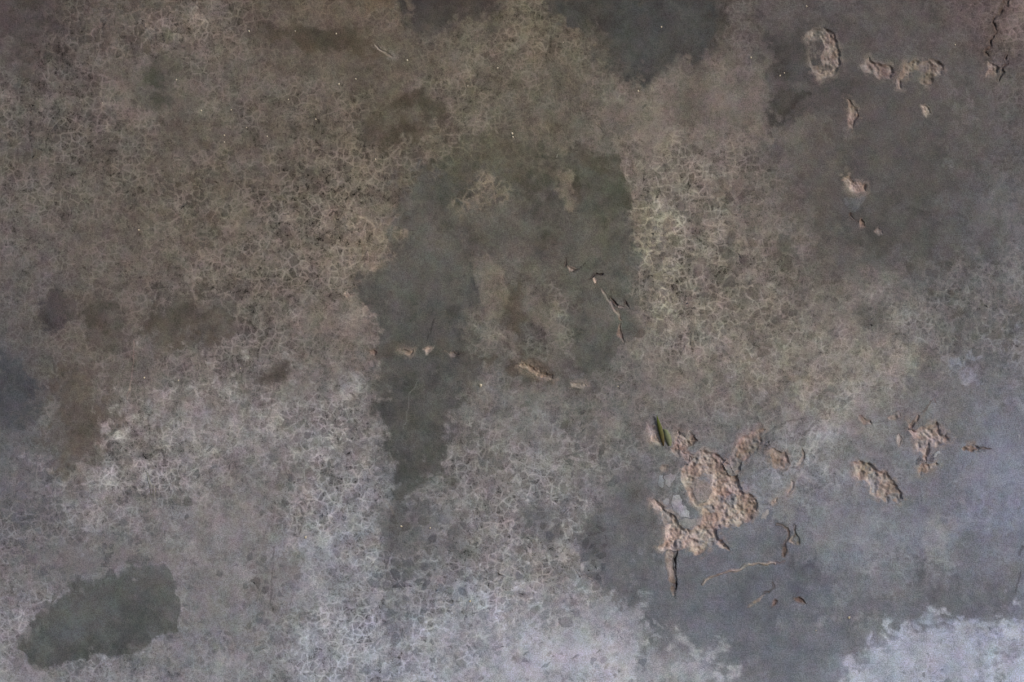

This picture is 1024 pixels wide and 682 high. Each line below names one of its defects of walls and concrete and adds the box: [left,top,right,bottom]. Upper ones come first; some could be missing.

spalling [799,22,951,137]
crack [980,0,1012,83]
spalling [834,169,884,237]
leakage [518,282,572,355]
spalling [511,355,594,394]
spalling [638,414,811,562]
spalling [845,408,994,510]